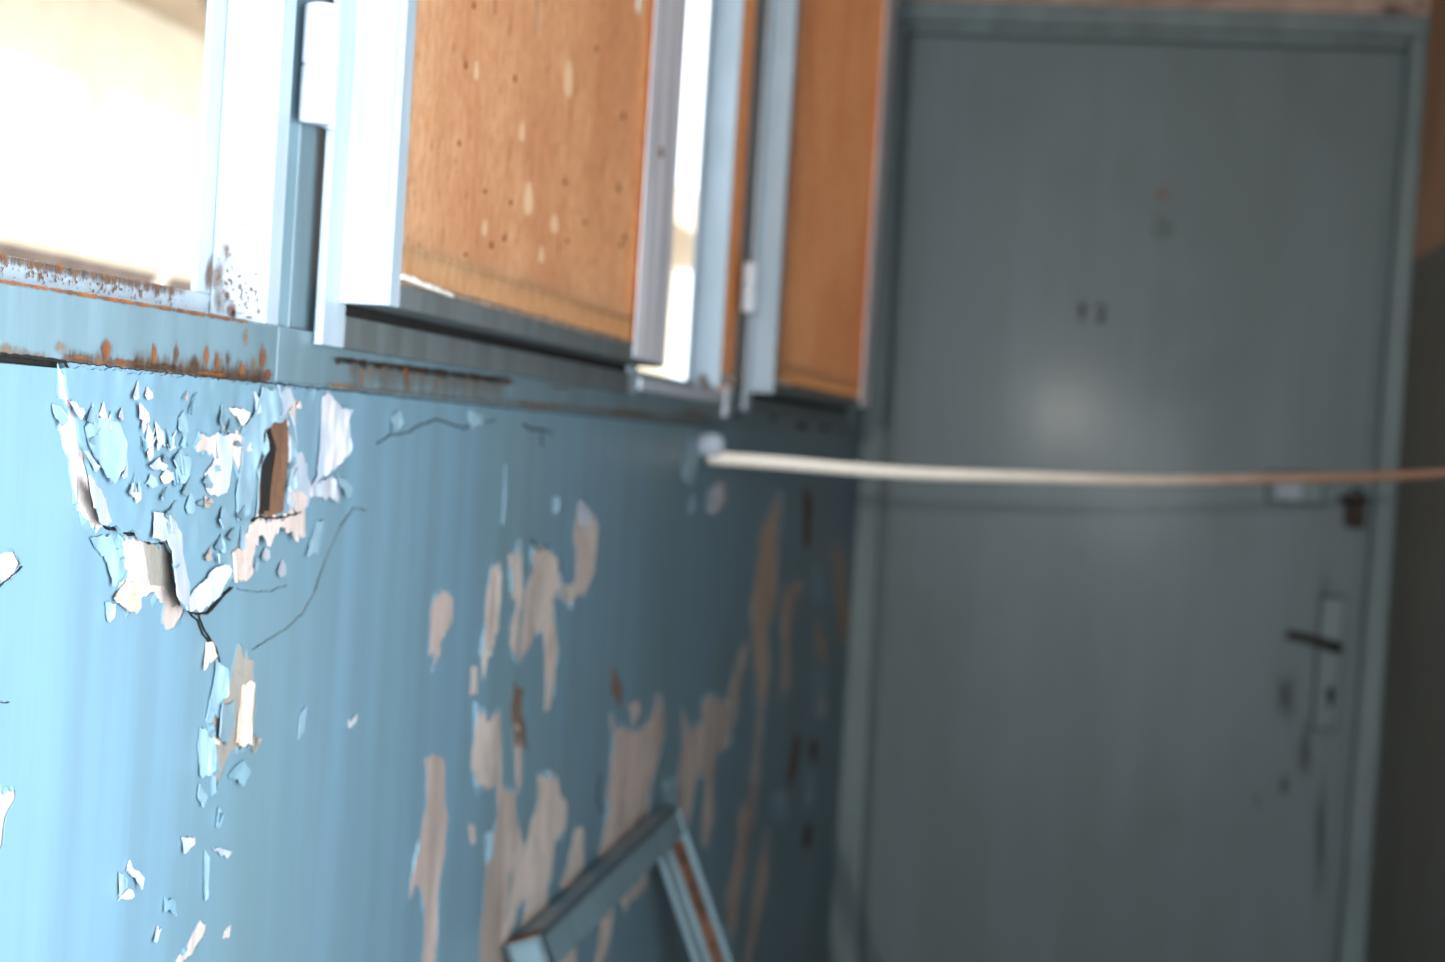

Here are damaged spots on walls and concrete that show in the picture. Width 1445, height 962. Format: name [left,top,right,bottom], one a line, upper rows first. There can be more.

corrosion [0,247,265,340]
corrosion [58,341,271,382]
crack [0,352,725,447]
peeling [0,548,23,587]
peeling [52,363,353,828]
crack [186,507,366,650]
peeling [427,586,453,673]
peeling [469,485,805,962]
peeling [117,860,144,901]
peeling [181,837,232,901]
peeling [408,750,448,962]
peeling [175,918,206,962]